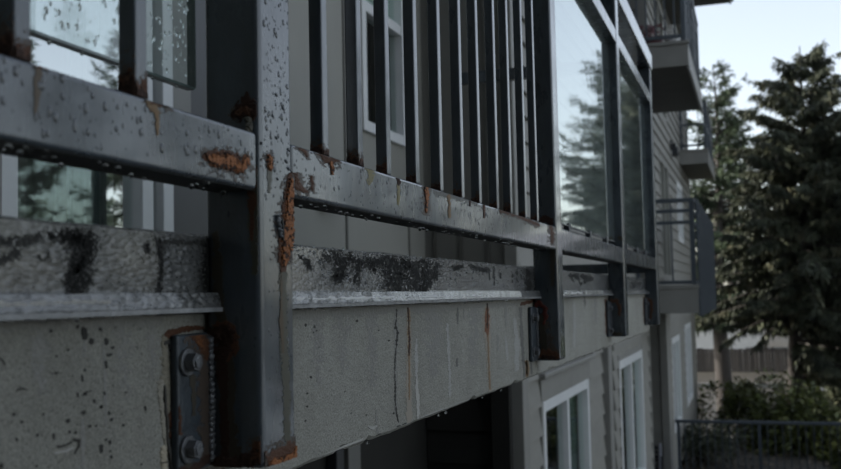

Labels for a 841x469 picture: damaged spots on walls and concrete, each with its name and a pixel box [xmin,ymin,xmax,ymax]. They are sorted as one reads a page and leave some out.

corrosion [0,10,49,116]
corrosion [118,45,175,136]
corrosion [228,91,257,124]
corrosion [293,135,387,185]
damp [0,225,107,292]
corrosion [164,139,317,469]
crack [392,309,400,422]
damp [293,301,533,419]
damp [297,249,535,291]
corrosion [396,166,556,286]
corrosion [520,299,559,360]